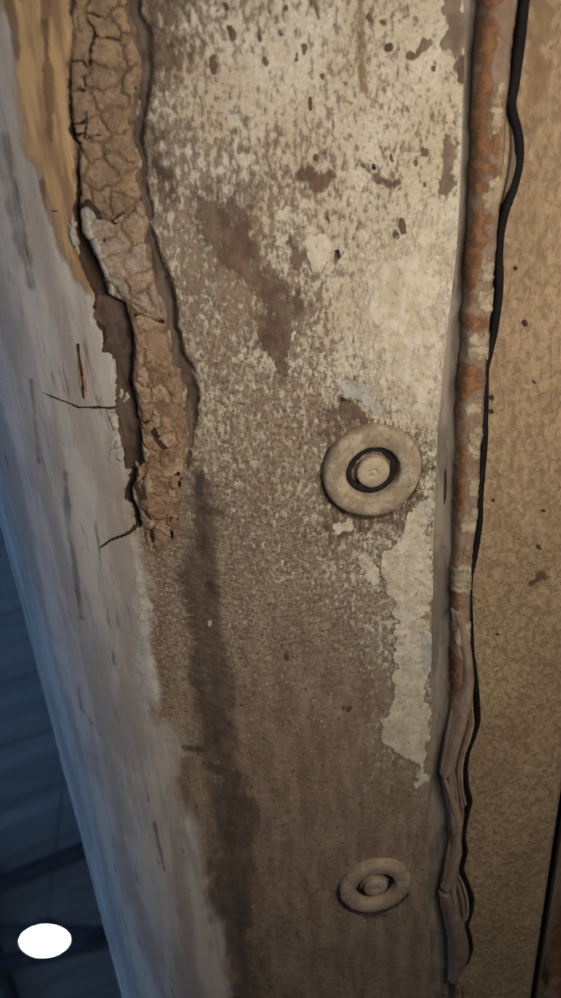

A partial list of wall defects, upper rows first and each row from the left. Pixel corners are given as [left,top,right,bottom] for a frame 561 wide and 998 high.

peeling [210,54,218,75]
corrosion [468,0,505,196]
damp [296,165,337,193]
damp [362,163,401,188]
crack [47,0,200,548]
peeling [67,0,188,557]
damp [196,174,313,382]
corrosion [452,209,494,331]
corrosion [455,363,486,417]
peeling [131,569,155,706]
damp [184,473,256,998]
corrosion [449,650,462,698]